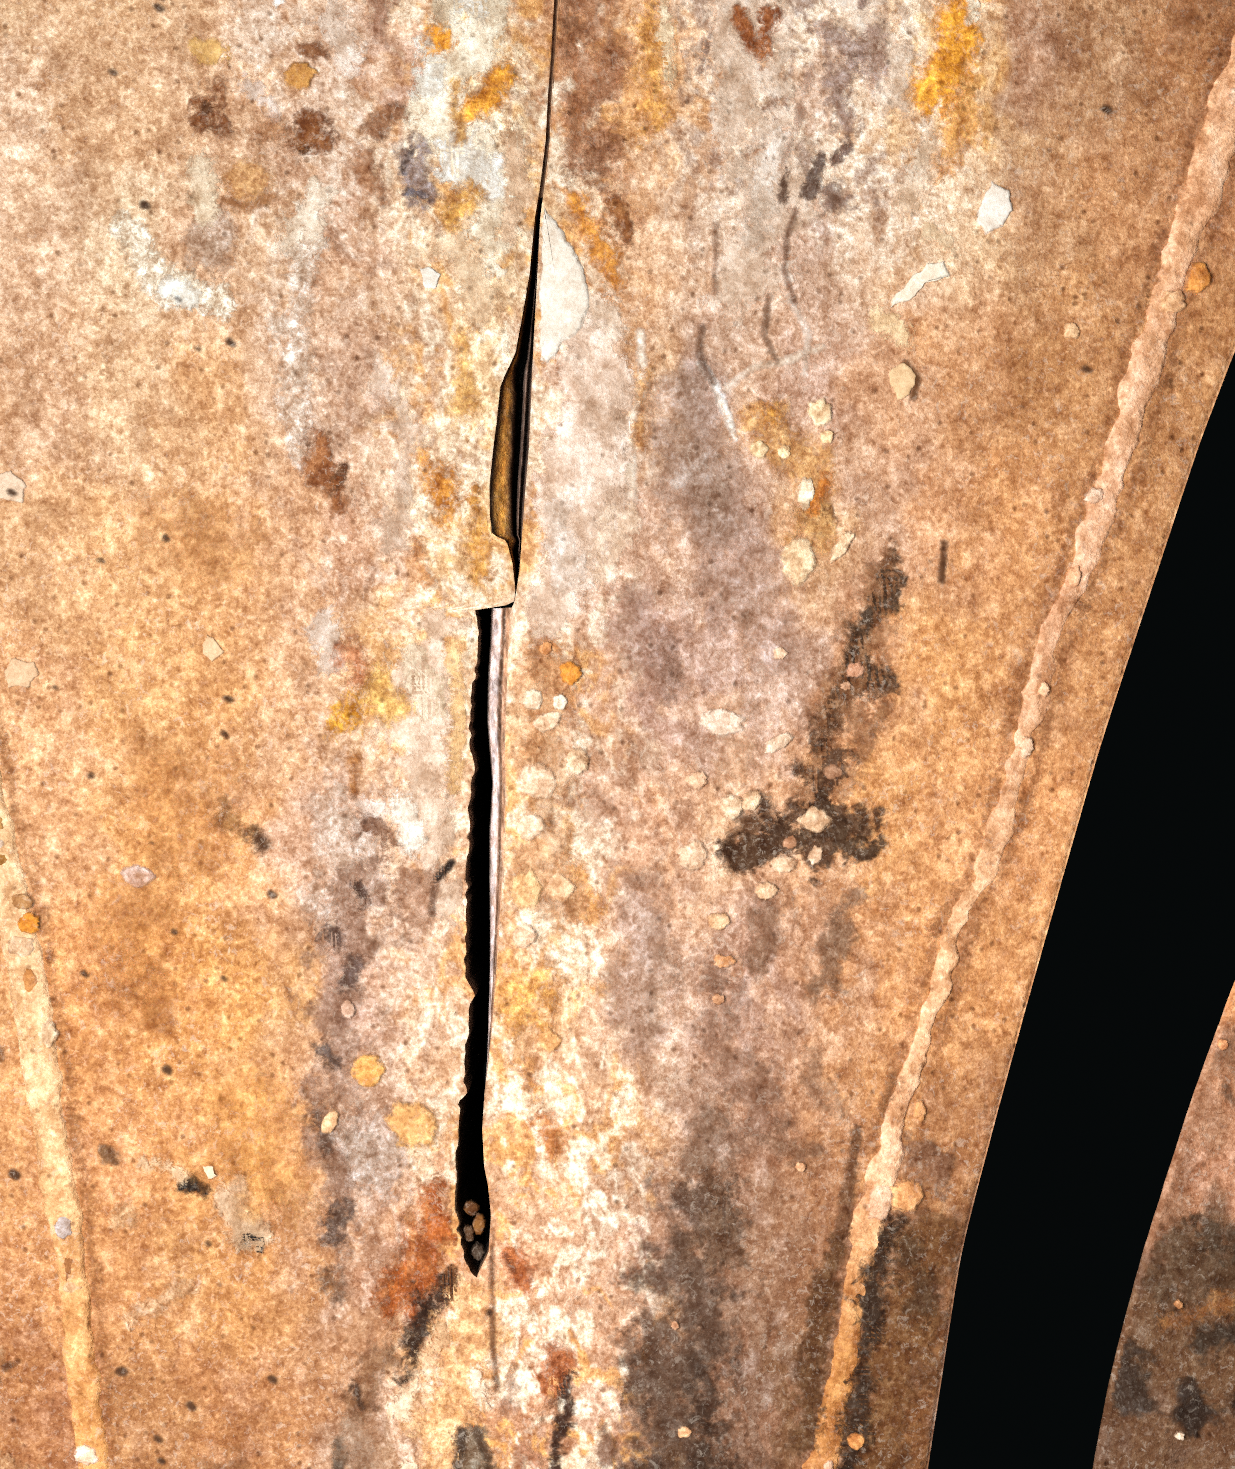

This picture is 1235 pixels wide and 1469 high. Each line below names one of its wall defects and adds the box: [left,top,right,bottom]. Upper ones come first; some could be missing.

rust [912,0,991,178]
damp [661,295,824,541]
crack [454,0,559,1389]
damp [608,592,681,702]
damp [705,571,792,669]
damp [806,888,866,1001]
damp [1216,1039,1228,1051]
rust [372,1152,457,1330]
damp [596,877,821,1469]
damp [784,1054,962,1469]
damp [1140,1213,1235,1355]
damp [1111,1340,1235,1439]